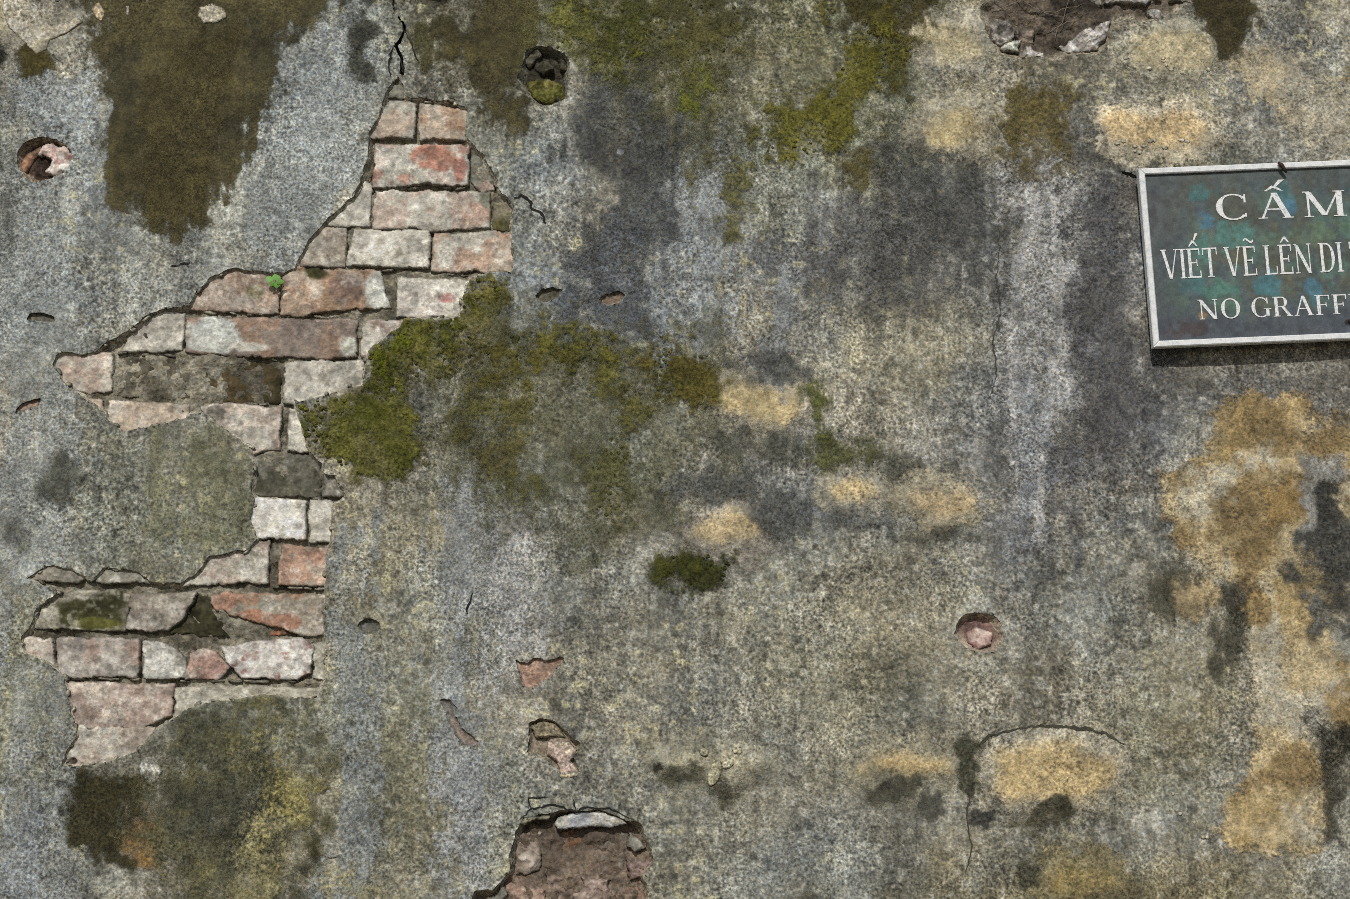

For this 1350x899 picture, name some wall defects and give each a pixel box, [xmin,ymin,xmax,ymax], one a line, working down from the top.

crack [388,0,419,76]
spalling [517,46,570,107]
spalling [980,0,1192,61]
leakage [1192,0,1350,162]
leakage [15,0,387,271]
spalling [1114,138,1190,155]
spalling [16,72,514,784]
spalling [954,612,1004,653]
leakage [1148,389,1350,857]
spalling [472,809,654,899]